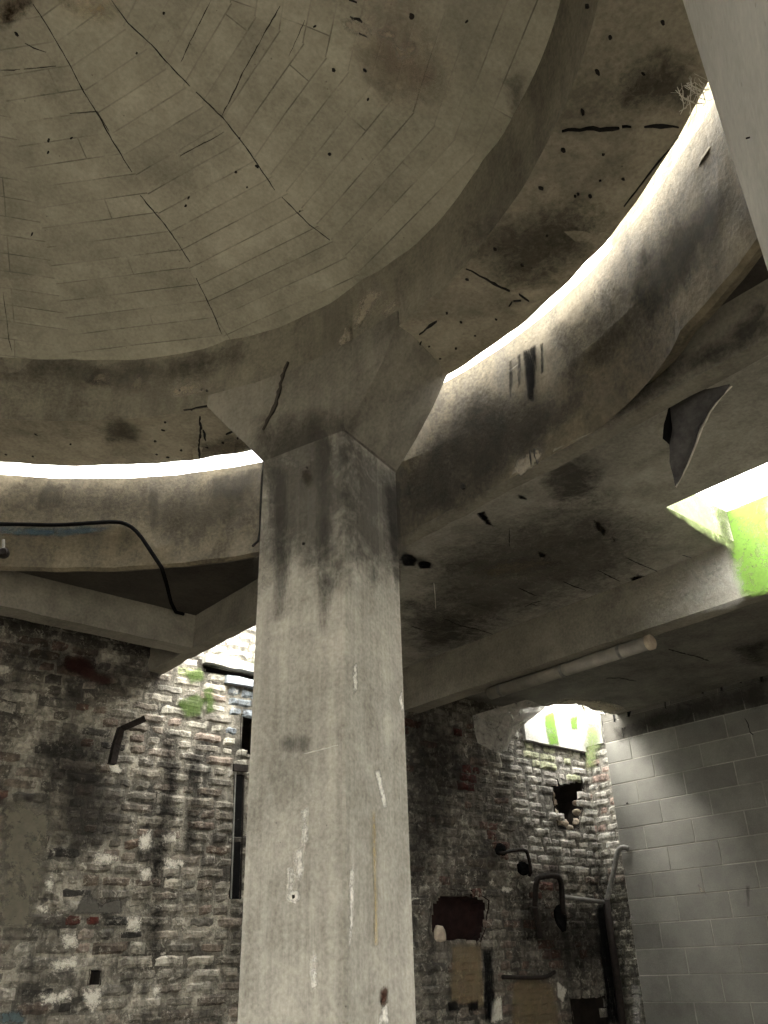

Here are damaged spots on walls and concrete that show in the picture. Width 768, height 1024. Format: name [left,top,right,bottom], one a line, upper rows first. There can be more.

crack [4,4,132,172]
crack [111,0,330,240]
crack [562,124,679,207]
crack [466,269,529,307]
crack [262,361,289,430]
water stain [509,343,543,401]
crack [183,405,233,459]
water stain [547,458,596,501]
spalling [551,779,585,831]
water stain [92,853,117,865]
water stain [51,932,79,970]
water stain [40,988,101,1013]